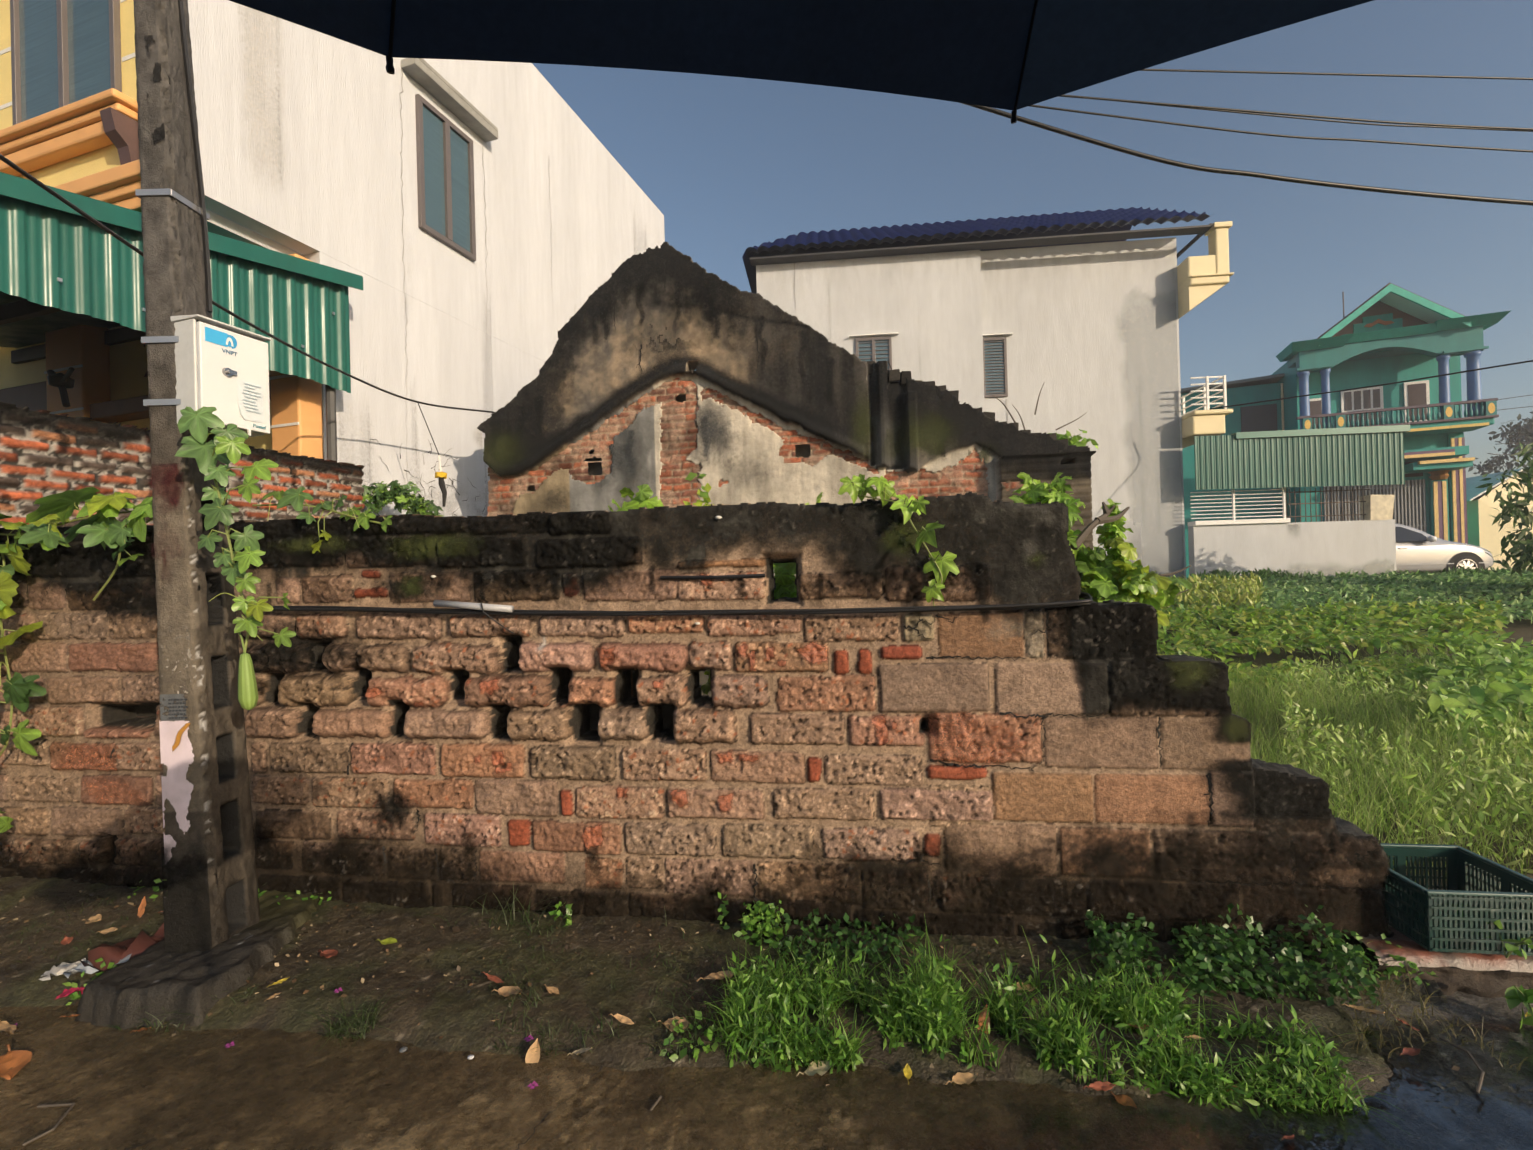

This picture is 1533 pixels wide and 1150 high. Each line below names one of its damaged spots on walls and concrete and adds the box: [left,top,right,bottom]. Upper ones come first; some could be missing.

water stain [477,242,1096,482]
flaking render [487,378,1024,516]
water stain [0,525,157,618]
water stain [229,491,1396,952]
water stain [0,833,212,954]